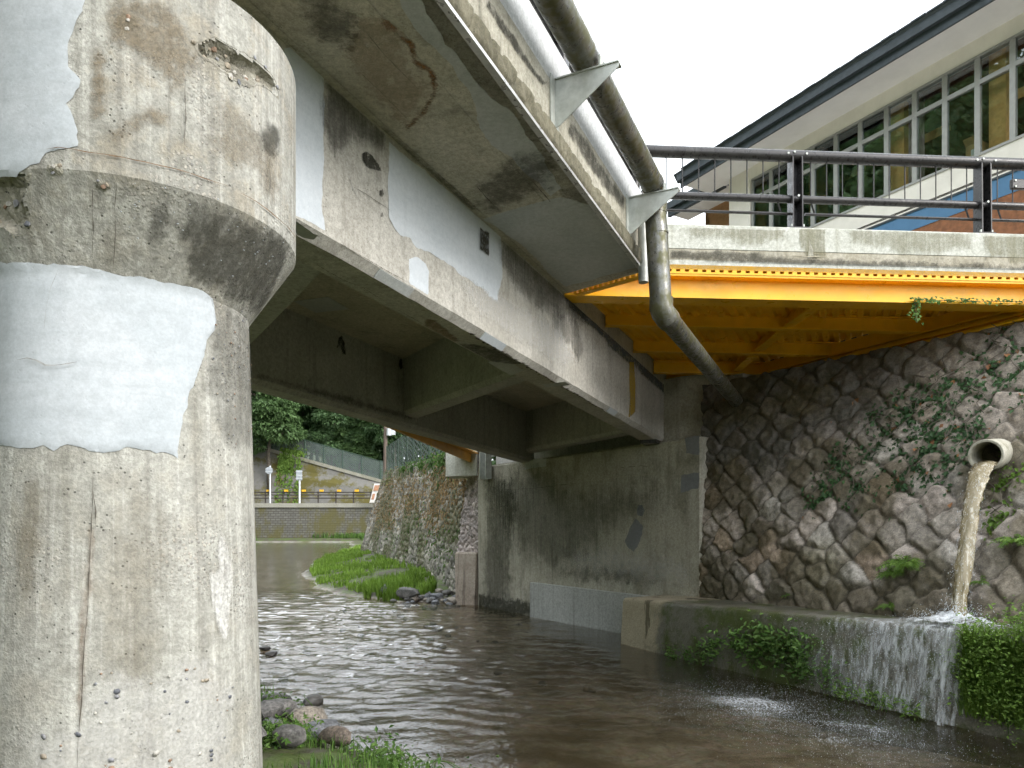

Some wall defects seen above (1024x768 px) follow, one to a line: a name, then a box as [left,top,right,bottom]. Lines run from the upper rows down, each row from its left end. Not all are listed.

spalling [191,36,279,99]
rust [383,21,437,129]
water stain [263,126,279,151]
water stain [173,204,285,312]
water stain [479,485,530,617]
crack [77,489,96,765]